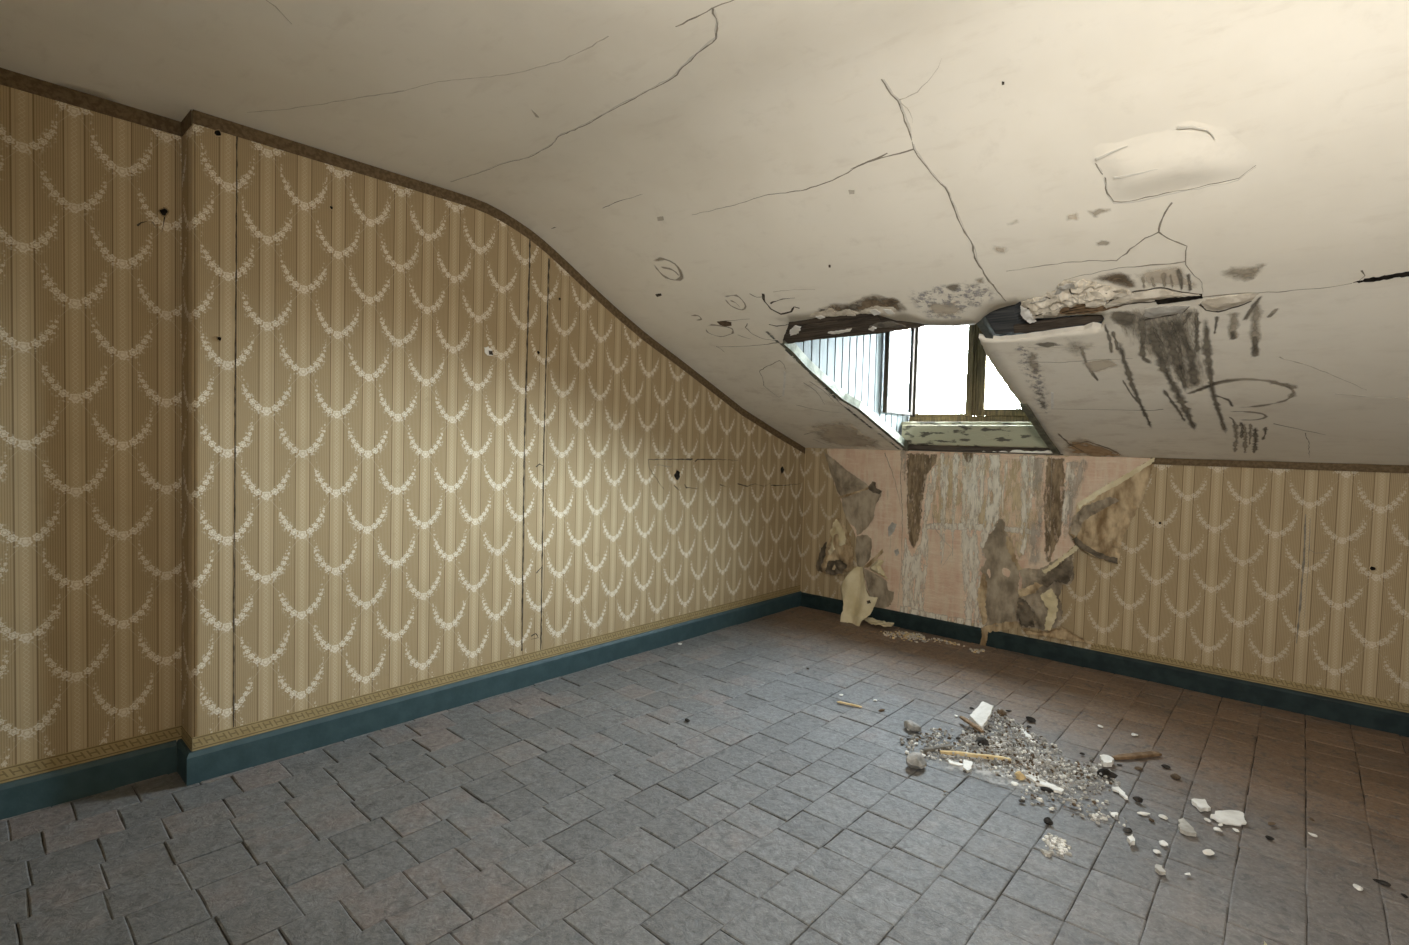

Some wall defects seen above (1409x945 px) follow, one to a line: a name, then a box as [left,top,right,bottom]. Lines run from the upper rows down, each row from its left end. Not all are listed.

crack [247,36,609,113]
crack [452,0,734,182]
crack [693,61,1409,301]
crack [716,289,882,450]
spalling [790,306,897,336]
peeling [1020,279,1259,323]
water stain [1100,268,1193,291]
water stain [1018,297,1296,453]
flaking render [827,448,1151,628]